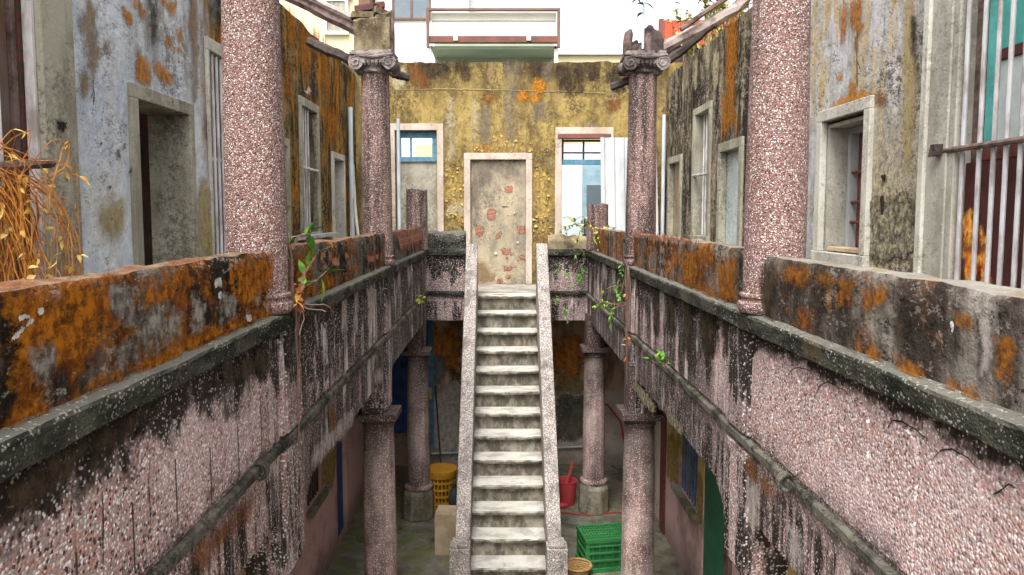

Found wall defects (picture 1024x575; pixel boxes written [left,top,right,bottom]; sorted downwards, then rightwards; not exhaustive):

peeling [444,163,553,284]
leakage [652,276,729,362]
leakage [760,265,776,320]
leakage [895,304,909,348]
crack [787,367,849,399]
leakage [5,401,161,512]
crack [886,419,981,471]